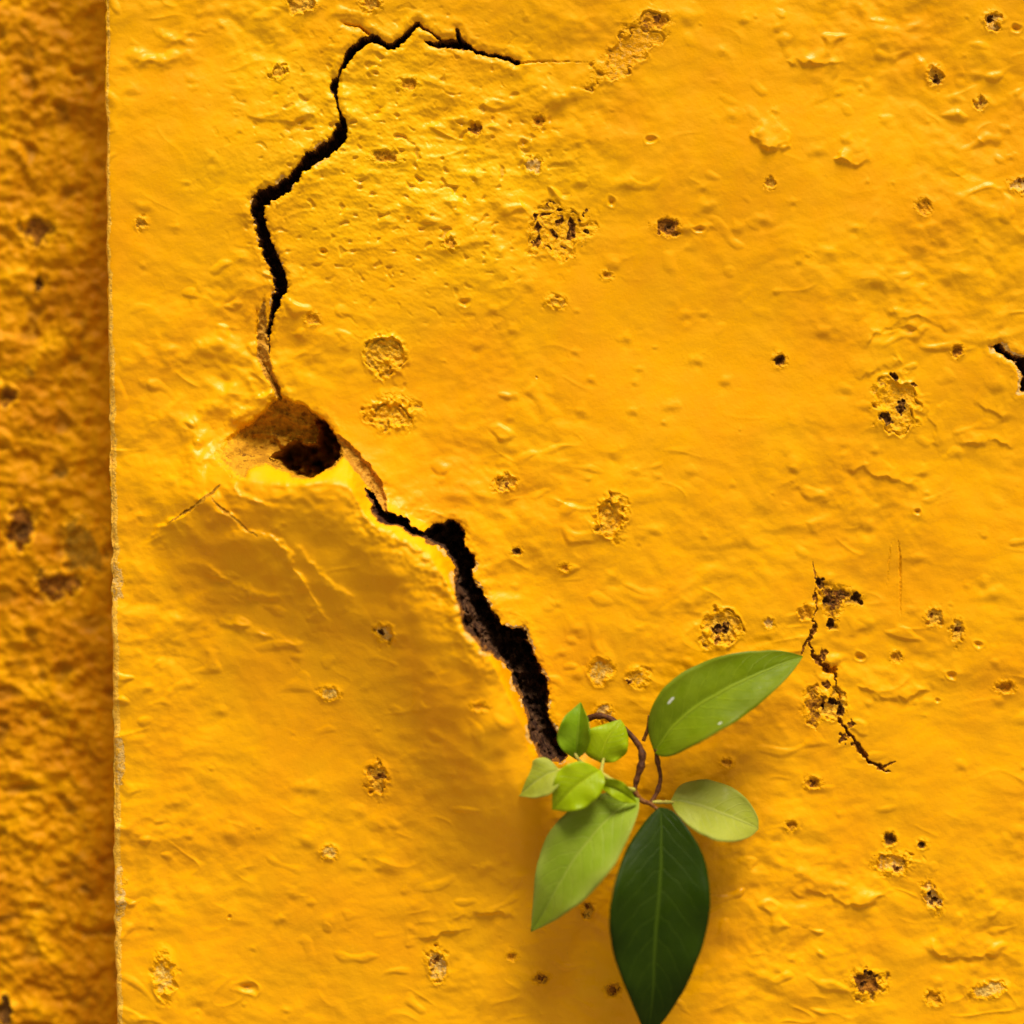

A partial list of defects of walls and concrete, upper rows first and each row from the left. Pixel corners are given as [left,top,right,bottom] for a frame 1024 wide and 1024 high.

peeling [579,2,675,94]
spalling [525,195,600,264]
crack [214,22,590,765]
spalling [868,368,924,438]
spalling [697,604,746,652]
crack [801,563,838,690]
crack [837,717,896,773]